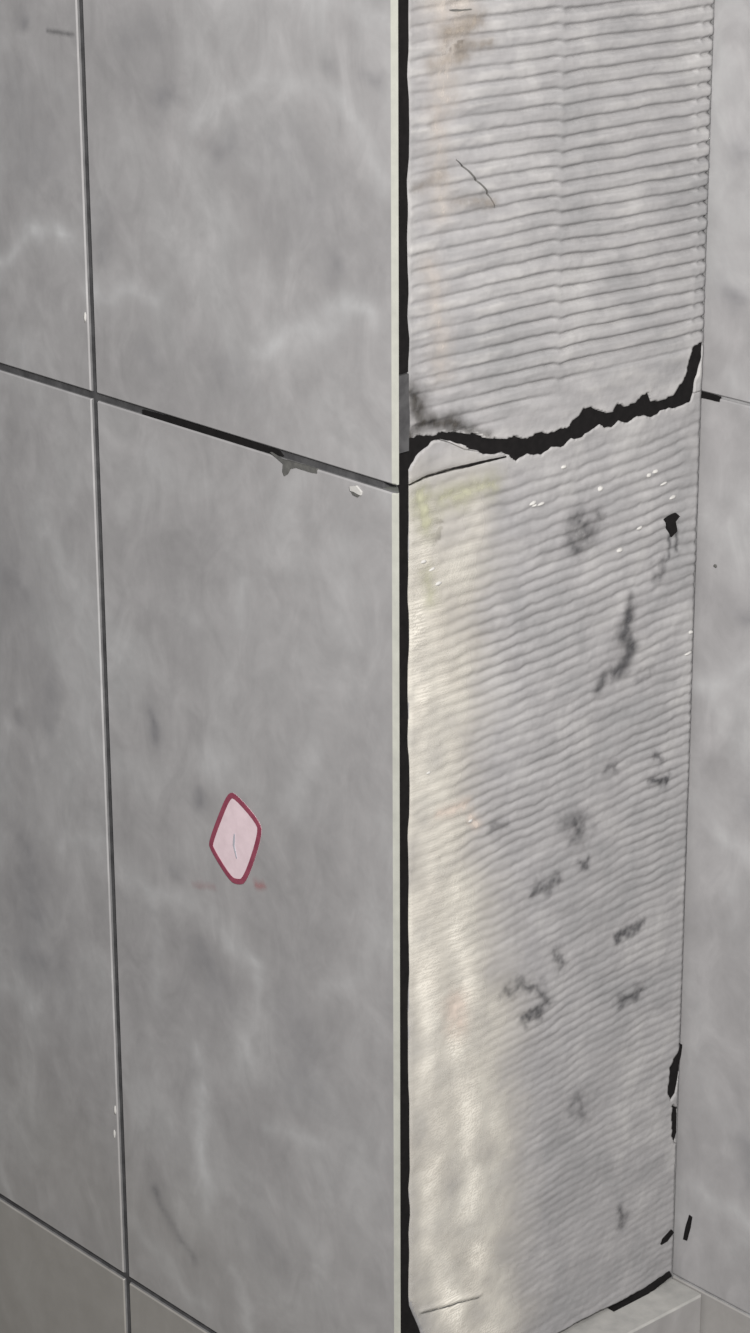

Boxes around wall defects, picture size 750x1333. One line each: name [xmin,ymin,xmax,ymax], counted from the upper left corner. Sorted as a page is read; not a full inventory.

crack [406,342,702,486]
leakage [597,610,635,691]